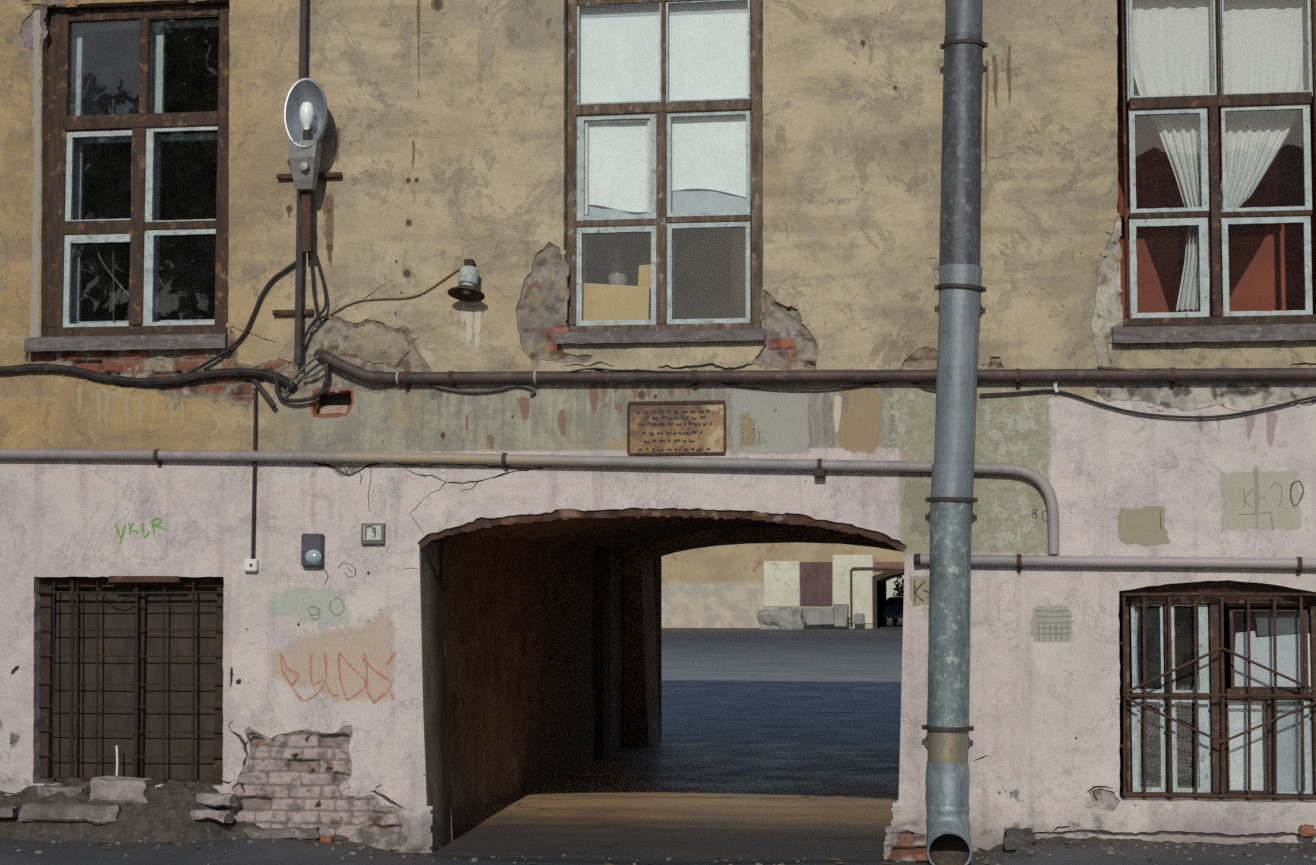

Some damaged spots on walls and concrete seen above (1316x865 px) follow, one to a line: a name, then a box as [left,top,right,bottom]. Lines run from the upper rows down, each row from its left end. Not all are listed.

spalling [20,0,432,418]
spalling [516,241,593,366]
spalling [751,288,819,370]
peeling [1090,213,1316,411]
crack [312,462,550,532]
spalling [229,725,414,841]